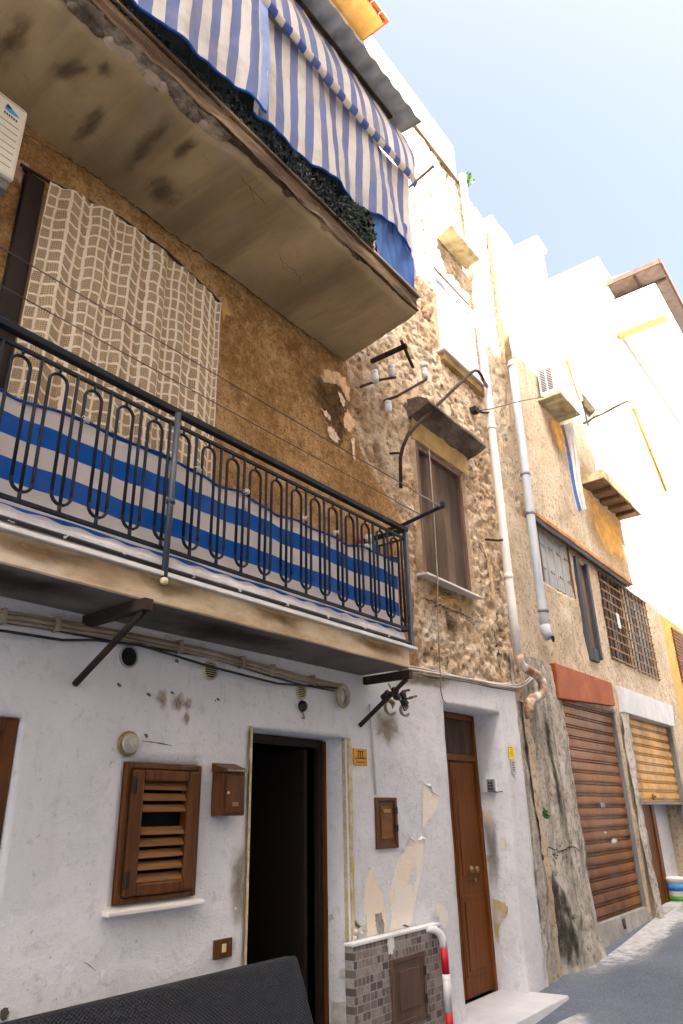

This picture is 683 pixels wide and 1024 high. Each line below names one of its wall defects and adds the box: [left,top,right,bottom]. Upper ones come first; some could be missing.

spalling [62,0,410,306]
flaking render [320,369,355,460]
damp [545,718,564,820]
peeling [328,738,440,954]
peeling [492,899,508,944]
damp [549,875,579,962]
peeling [330,1001,346,1024]